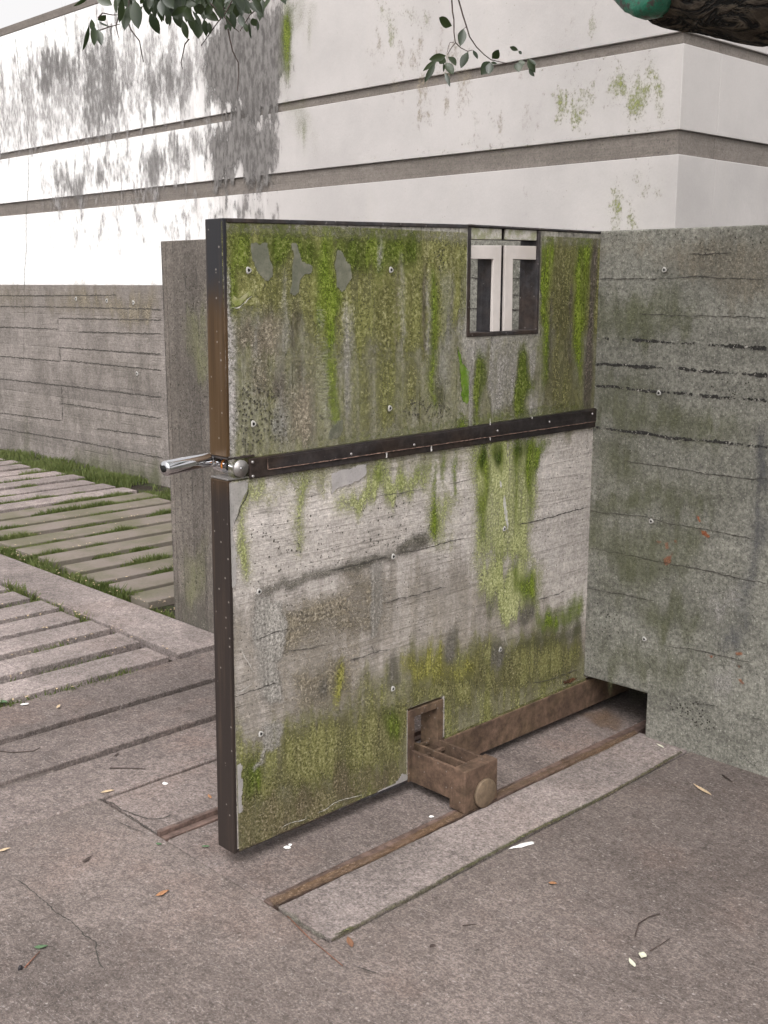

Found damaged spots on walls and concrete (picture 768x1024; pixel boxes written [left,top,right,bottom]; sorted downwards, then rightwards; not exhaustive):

peeling [251,242,273,281]
peeling [290,243,313,296]
peeling [335,250,352,292]
water stain [492,440,545,492]
water stain [263,532,430,652]
water stain [514,566,536,623]
water stain [293,658,352,707]
water stain [239,764,401,851]
crack [16,879,103,968]